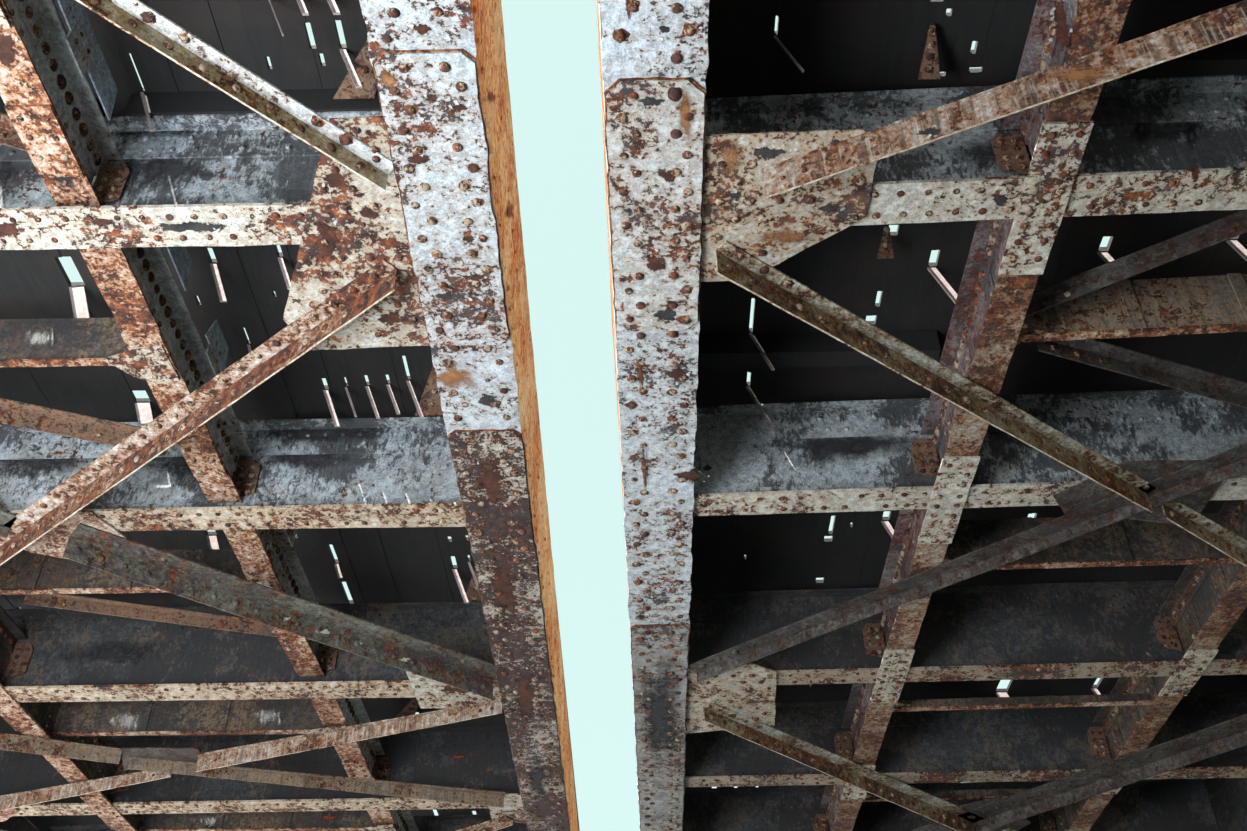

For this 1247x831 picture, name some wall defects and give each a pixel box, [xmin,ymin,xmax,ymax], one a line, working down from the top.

corrosion [407,23,431,38]
corrosion [0,34,22,69]
corrosion [422,94,468,116]
corrosion [404,151,432,164]
corrosion [652,164,681,190]
corrosion [0,222,34,239]
corrosion [73,218,123,228]
corrosion [305,218,351,265]
corrosion [360,208,389,223]
corrosion [646,248,666,278]
corrosion [376,308,405,330]
corrosion [434,368,473,386]